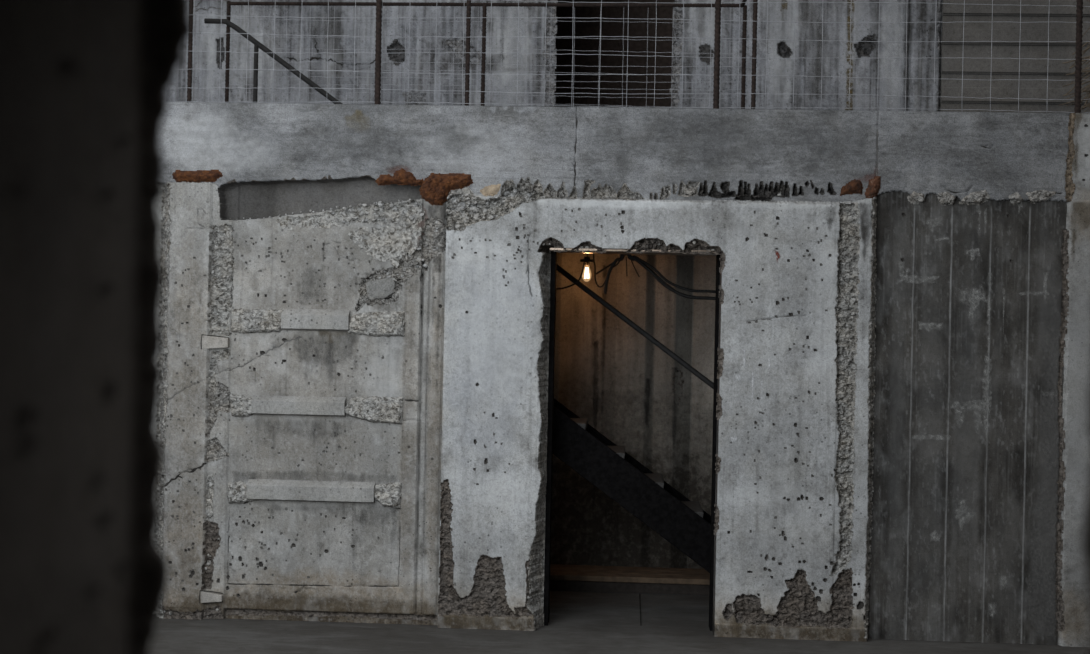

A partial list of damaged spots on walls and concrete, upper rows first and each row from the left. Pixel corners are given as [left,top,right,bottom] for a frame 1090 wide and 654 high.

spalling [387,39,405,66]
spalling [777,41,793,58]
spalling [854,34,877,58]
corrosion [172,170,223,183]
corrosion [375,168,473,206]
corrosion [840,176,881,198]
crack [166,337,302,402]
spalling [156,177,877,638]
crack [163,463,207,487]